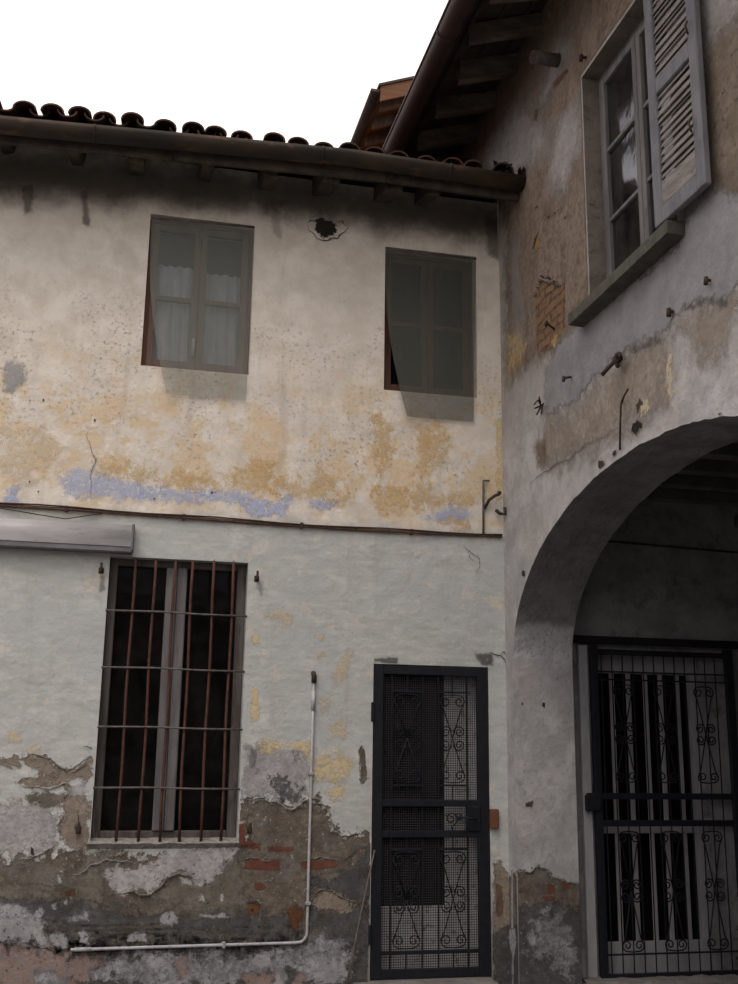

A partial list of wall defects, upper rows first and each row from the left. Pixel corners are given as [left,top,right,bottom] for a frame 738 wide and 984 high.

hole [308,216,348,241]
peeling [460,0,632,383]
peeling [669,290,738,366]
peeling [536,335,673,475]
peeling [4,485,20,503]
peeling [63,455,350,517]
peeling [370,413,473,531]
flaking render [0,731,370,984]
flaking render [492,860,582,984]